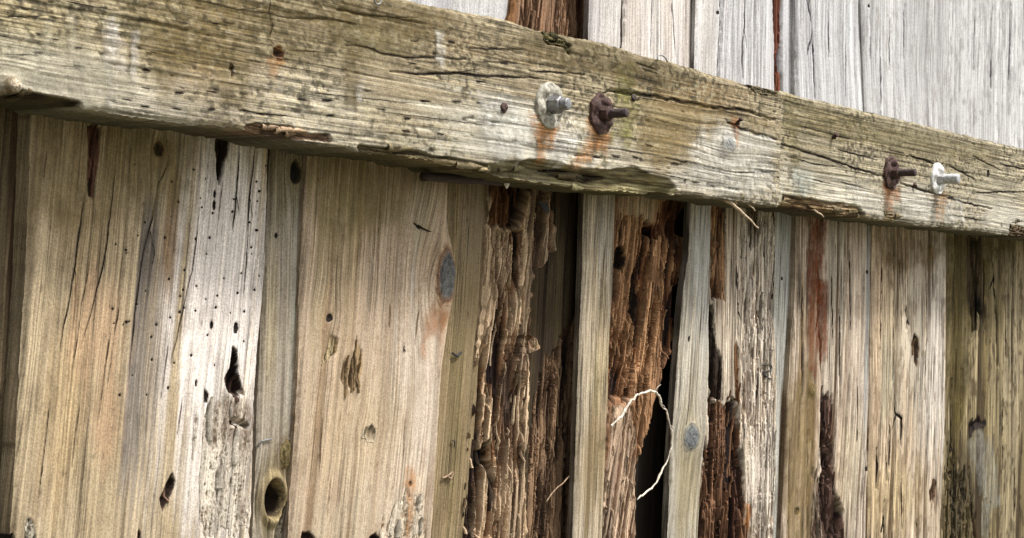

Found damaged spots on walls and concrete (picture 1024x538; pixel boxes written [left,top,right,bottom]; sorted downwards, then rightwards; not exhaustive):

crack [0,0,1024,221]
spalling [708,310,739,401]
spalling [463,435,494,514]